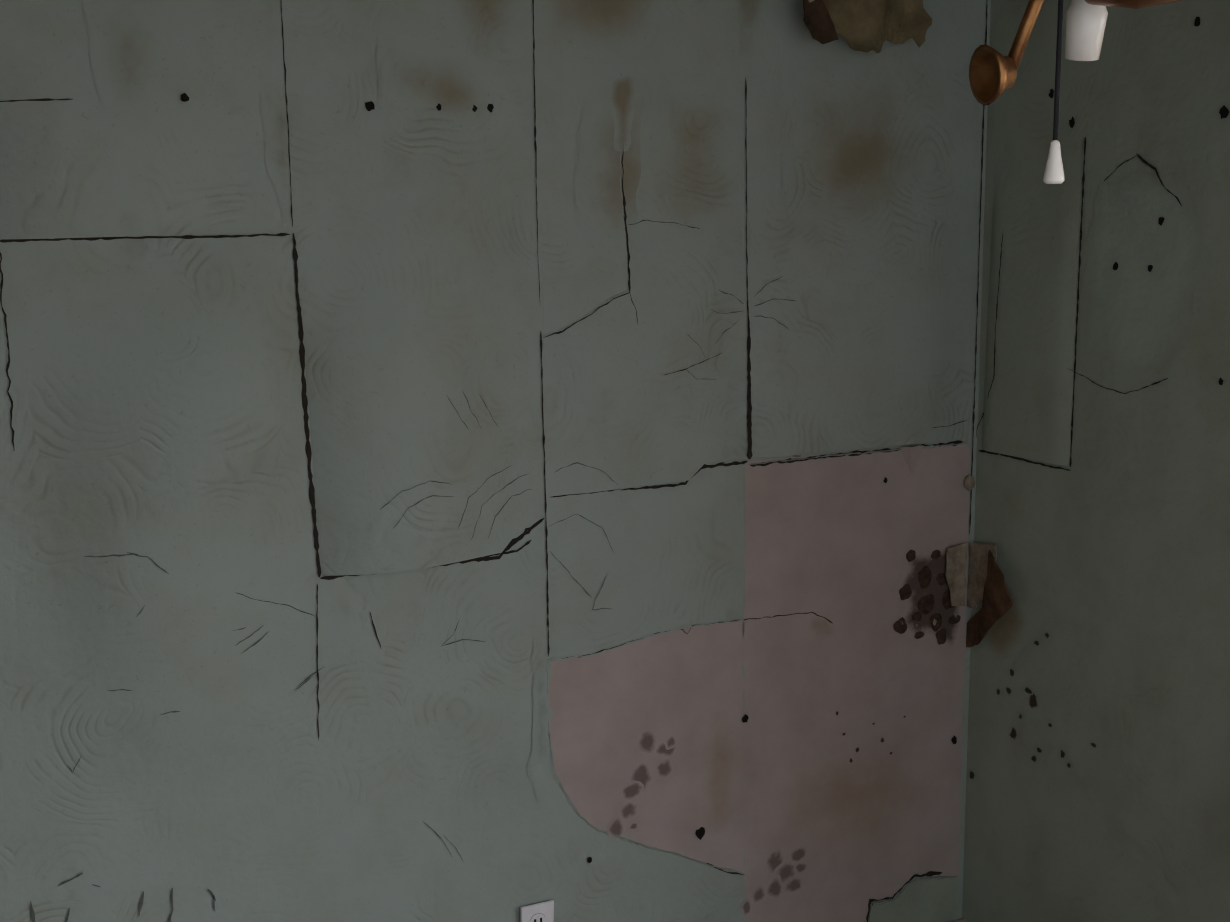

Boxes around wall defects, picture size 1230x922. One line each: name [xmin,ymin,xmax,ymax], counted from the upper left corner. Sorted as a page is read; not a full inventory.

crack [0,0,359,740]
crack [532,0,540,298]
crack [435,80,753,657]
damp [607,728,677,839]
peeling [546,440,971,922]
damp [692,693,952,916]